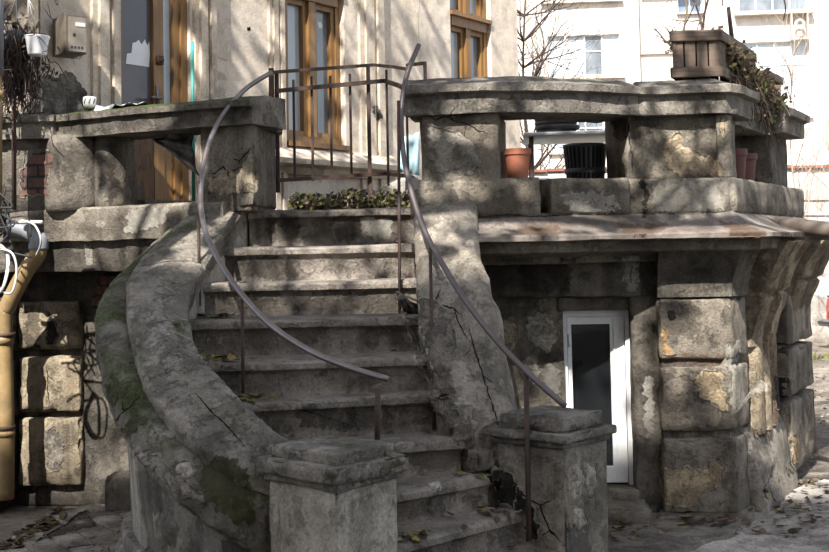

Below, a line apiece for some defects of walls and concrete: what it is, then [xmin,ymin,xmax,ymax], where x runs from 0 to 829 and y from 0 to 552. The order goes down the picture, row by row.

crack [208,146,254,177]
peeling [424,123,483,179]
spalling [662,131,725,178]
crack [417,290,501,427]
spalling [694,368,730,413]
crack [194,392,242,443]
spalling [484,467,542,543]
crack [515,492,563,543]
spalling [659,456,727,509]